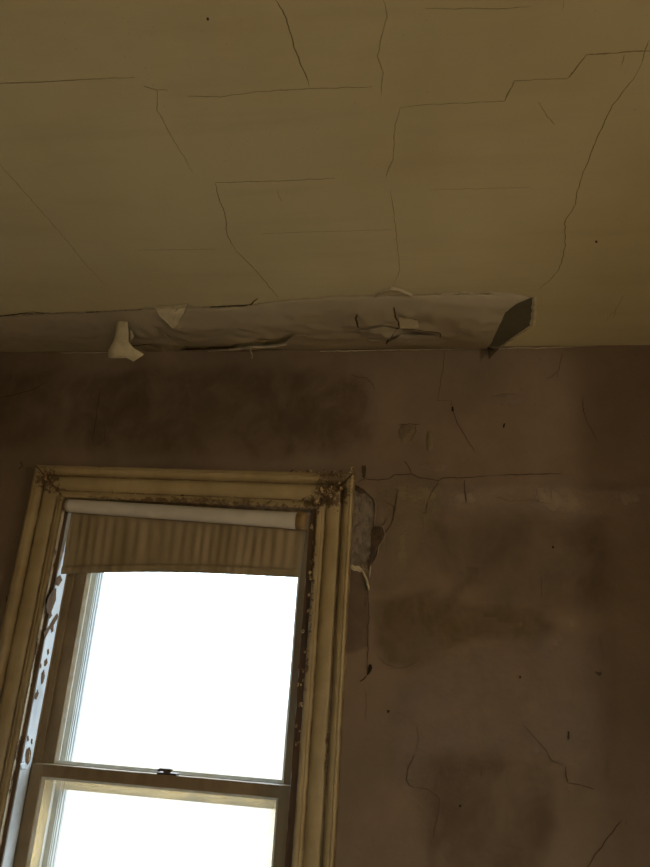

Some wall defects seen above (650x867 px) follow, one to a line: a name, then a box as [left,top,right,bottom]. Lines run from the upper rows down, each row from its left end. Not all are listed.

crack [192,0,388,97]
crack [0,77,192,171]
crack [386,41,649,289]
crack [215,178,327,297]
spalling [290,465,386,591]
crack [314,461,559,532]
spalling [0,510,65,847]